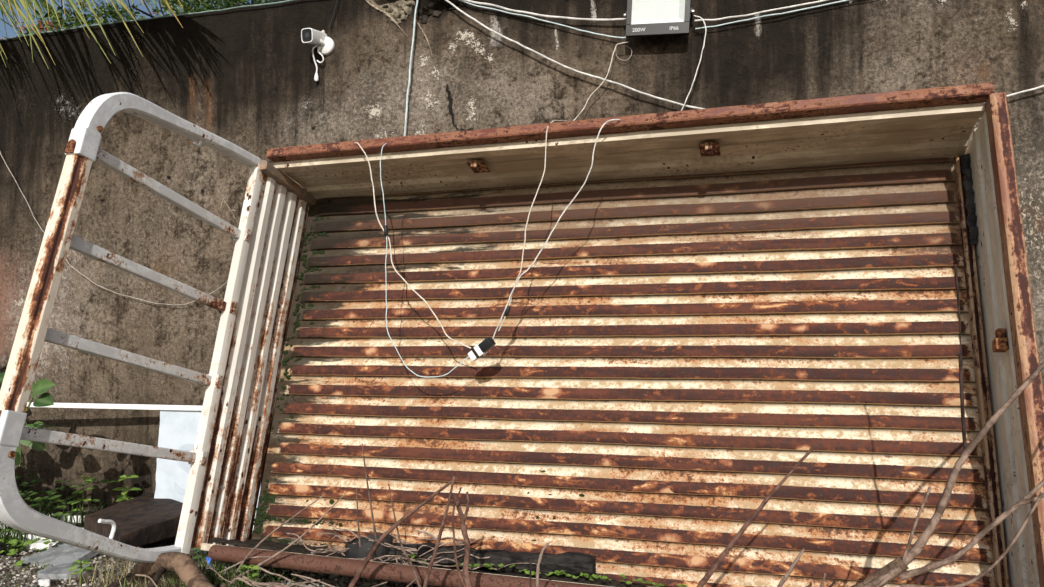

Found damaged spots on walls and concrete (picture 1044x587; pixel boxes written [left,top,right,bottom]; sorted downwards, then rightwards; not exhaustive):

flaking render [367,0,467,24]
crack [445,84,474,131]